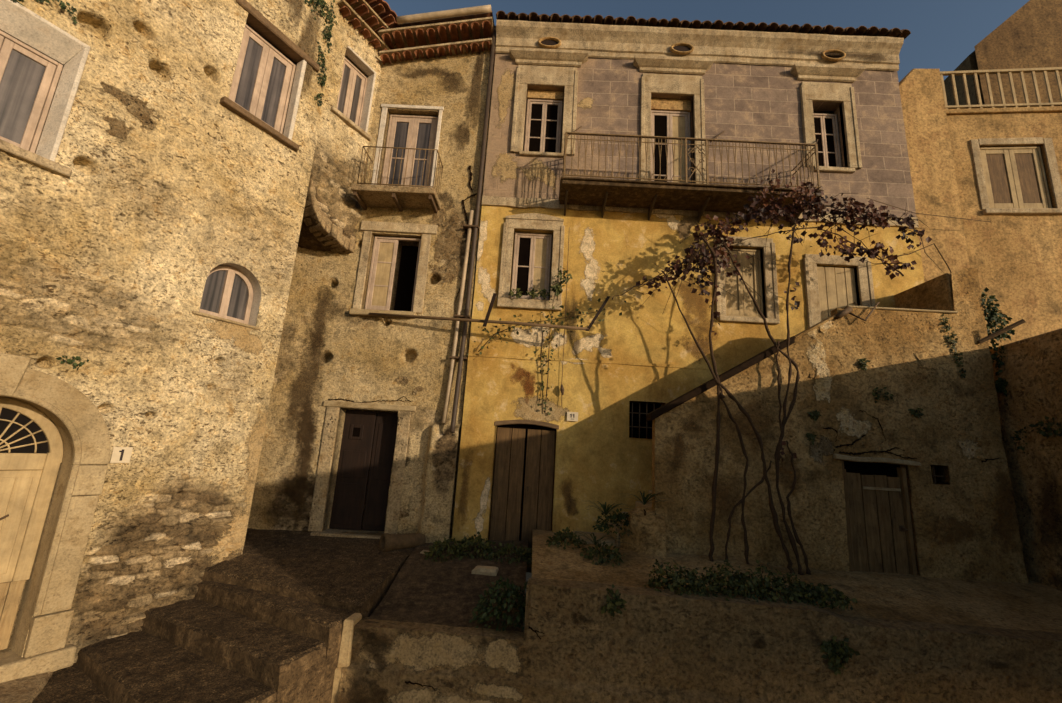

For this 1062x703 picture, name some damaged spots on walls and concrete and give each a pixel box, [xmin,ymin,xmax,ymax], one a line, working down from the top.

water stain [285,288,335,513]
flaking render [806,320,877,443]